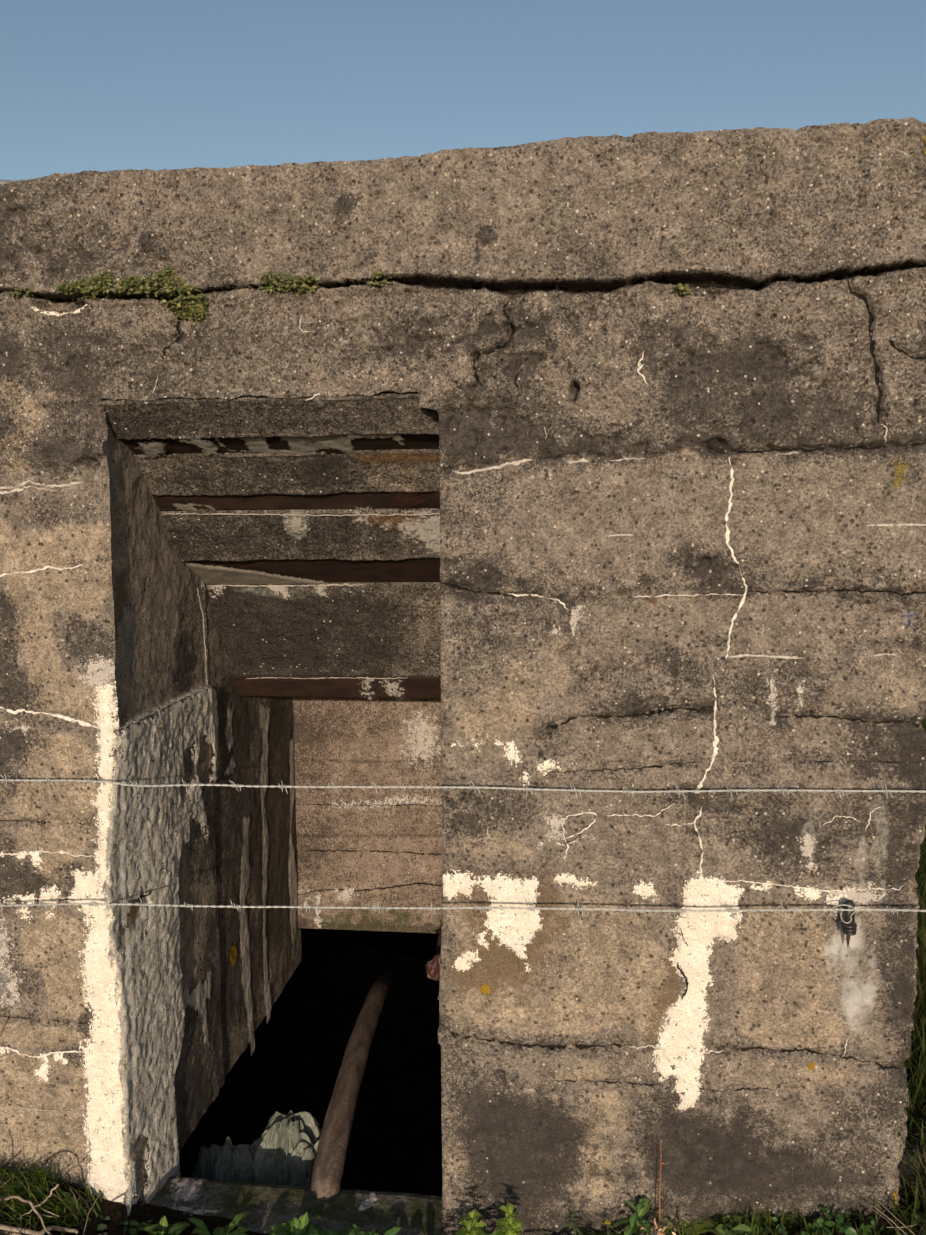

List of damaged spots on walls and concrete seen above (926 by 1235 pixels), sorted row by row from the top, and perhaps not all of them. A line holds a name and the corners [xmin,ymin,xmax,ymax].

crack [0,264,926,893]
damp [443,869,843,1234]